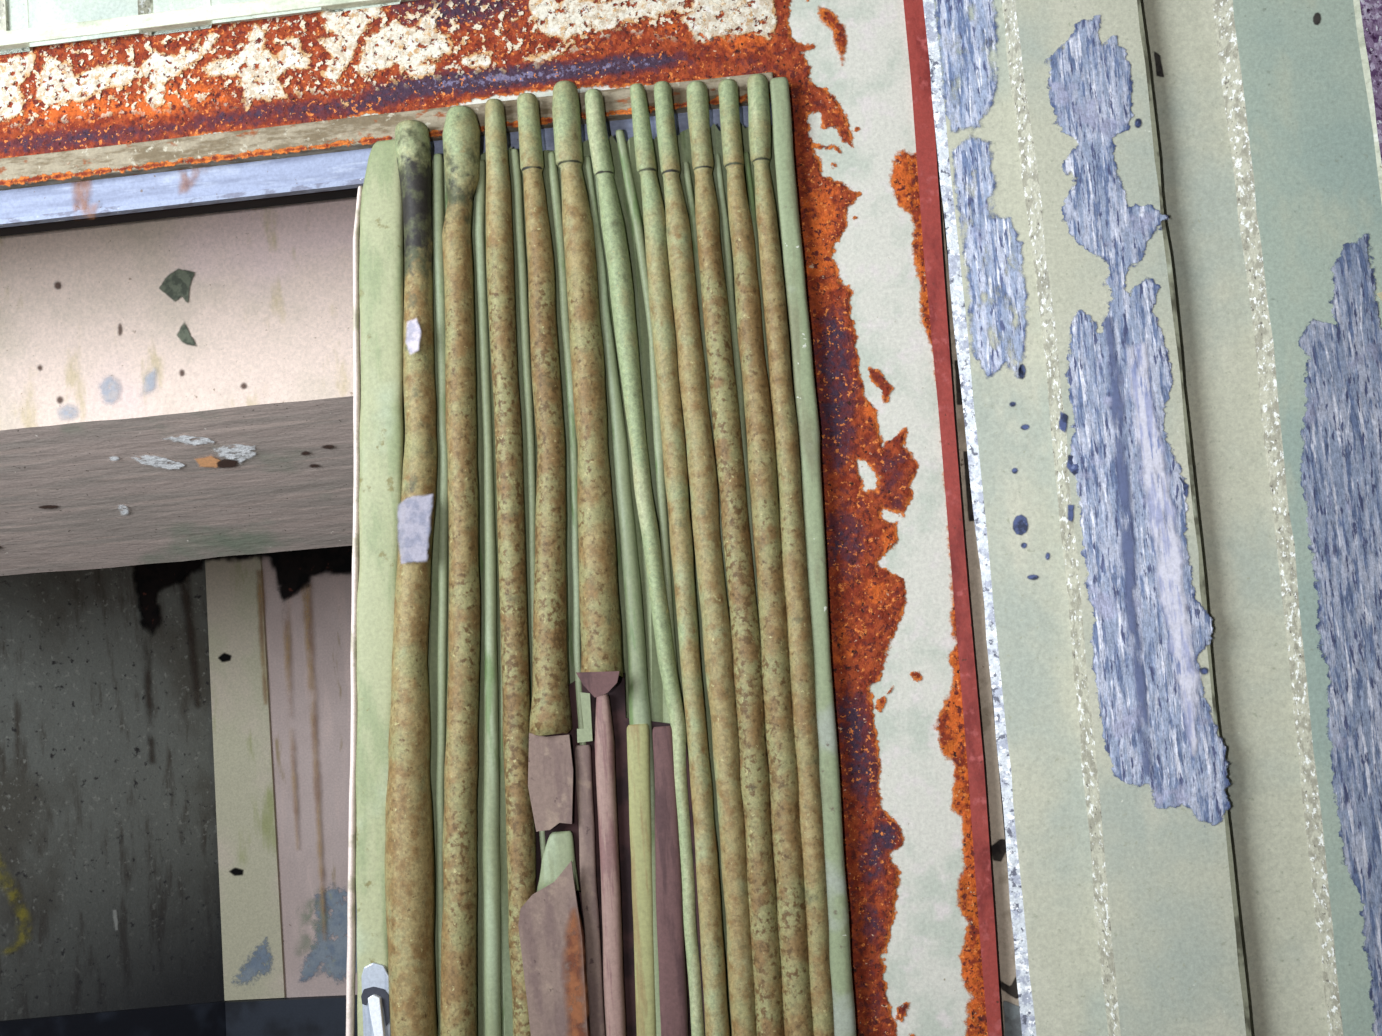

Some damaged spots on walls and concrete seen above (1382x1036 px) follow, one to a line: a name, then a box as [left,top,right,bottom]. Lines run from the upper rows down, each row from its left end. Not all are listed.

corrosion [0,0,919,1036]
corrosion [890,150,933,352]
corrosion [936,582,988,1036]
peeling [935,0,1028,379]
peeling [1013,515,1028,548]
peeling [1044,15,1230,826]
peeling [1298,233,1382,1036]